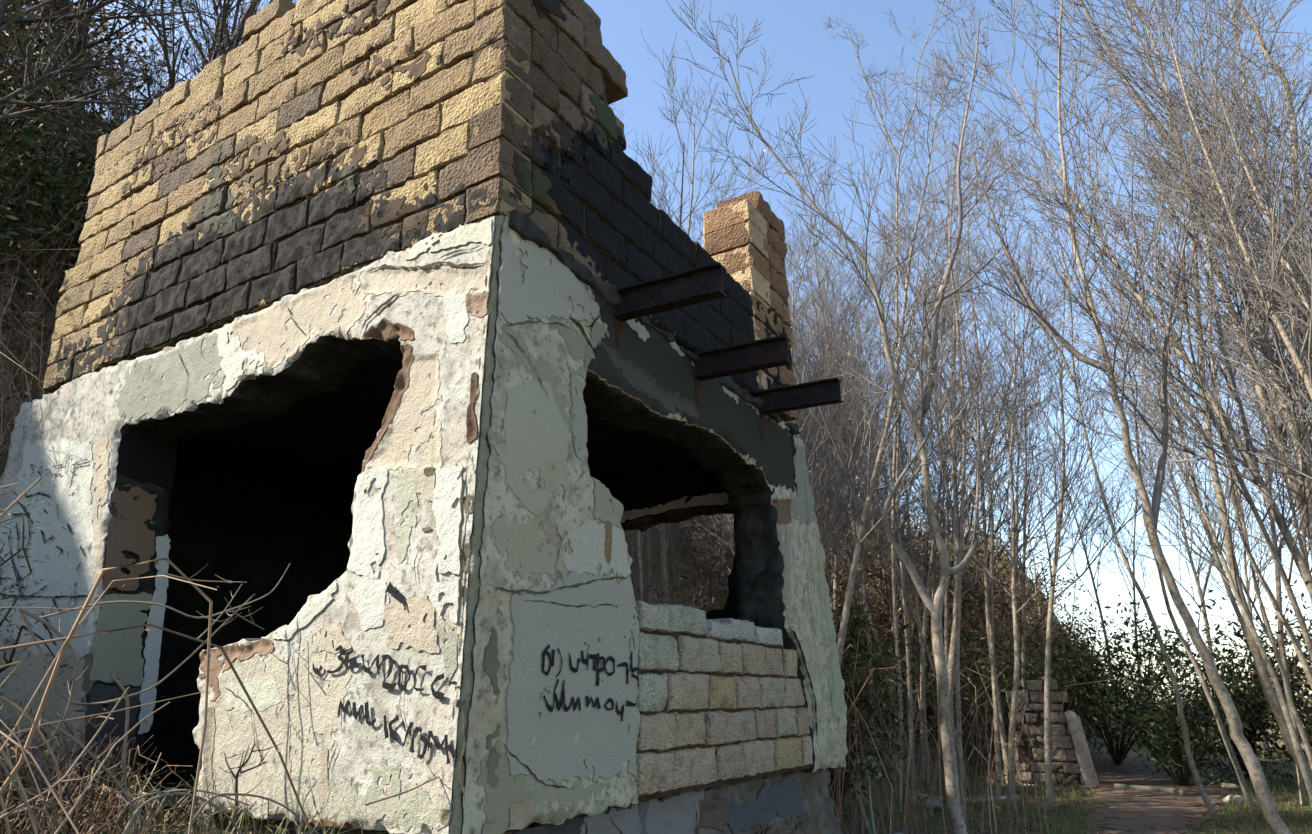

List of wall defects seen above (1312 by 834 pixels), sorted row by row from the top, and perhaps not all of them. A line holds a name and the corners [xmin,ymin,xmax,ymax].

spalling [281,0,445,90]
spalling [122,96,222,194]
water stain [217,129,300,191]
spalling [293,127,371,172]
water stain [358,197,428,236]
water stain [117,329,264,421]
peeling [0,436,170,734]